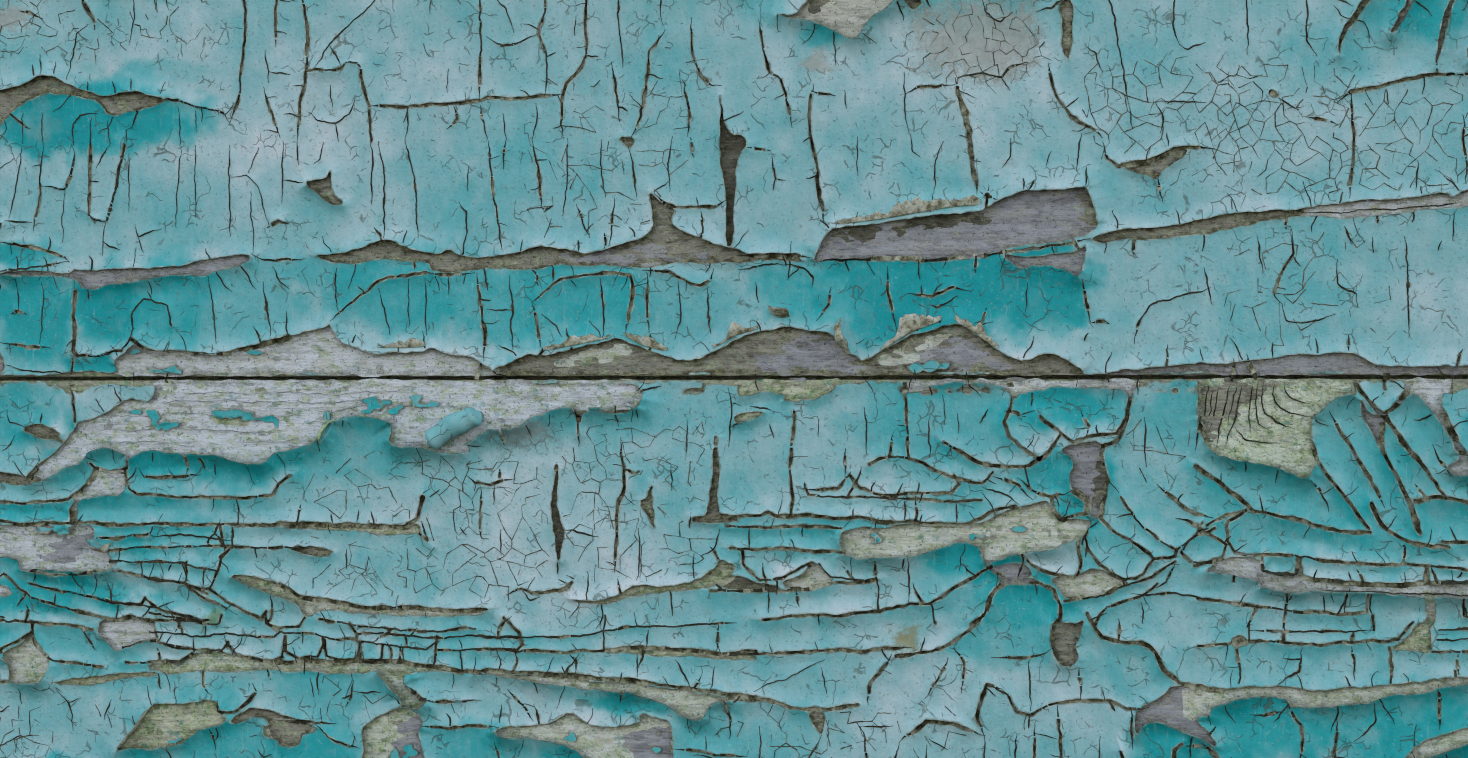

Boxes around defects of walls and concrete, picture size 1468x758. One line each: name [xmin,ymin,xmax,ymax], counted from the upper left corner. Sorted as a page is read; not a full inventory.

peeling [777,0,921,43]
peeling [1334,0,1370,52]
peeling [1391,0,1468,58]
crack [0,0,1090,374]
peeling [318,103,1468,291]
crack [903,0,1468,357]
crack [303,389,1149,758]
peeling [0,248,1468,758]
crack [1126,417,1213,518]
crack [1311,411,1385,512]
crack [193,660,534,758]
crack [1250,595,1377,758]